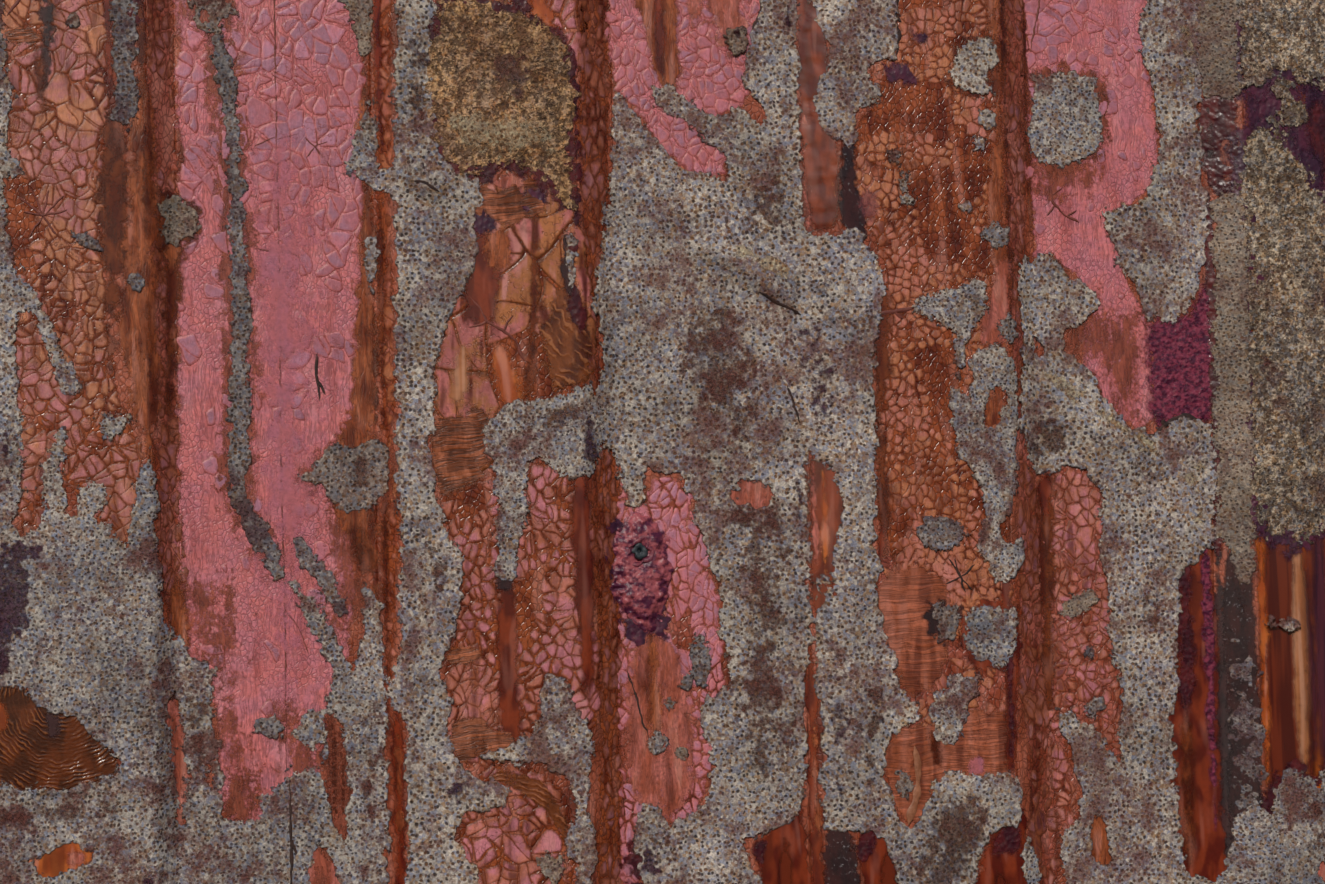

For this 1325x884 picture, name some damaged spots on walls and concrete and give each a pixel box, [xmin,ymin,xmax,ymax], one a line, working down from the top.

corrosion [0,686,118,825]
corrosion [28,841,93,880]
crack [0,0,403,884]
peeling [0,0,601,884]
crack [430,0,763,884]
peeling [481,0,1043,884]
corrosion [857,830,900,884]
corrosion [867,710,1028,884]
crack [854,0,1206,884]
corrosion [1090,813,1112,865]
peeling [912,0,1325,884]
corrosion [1249,457,1325,815]